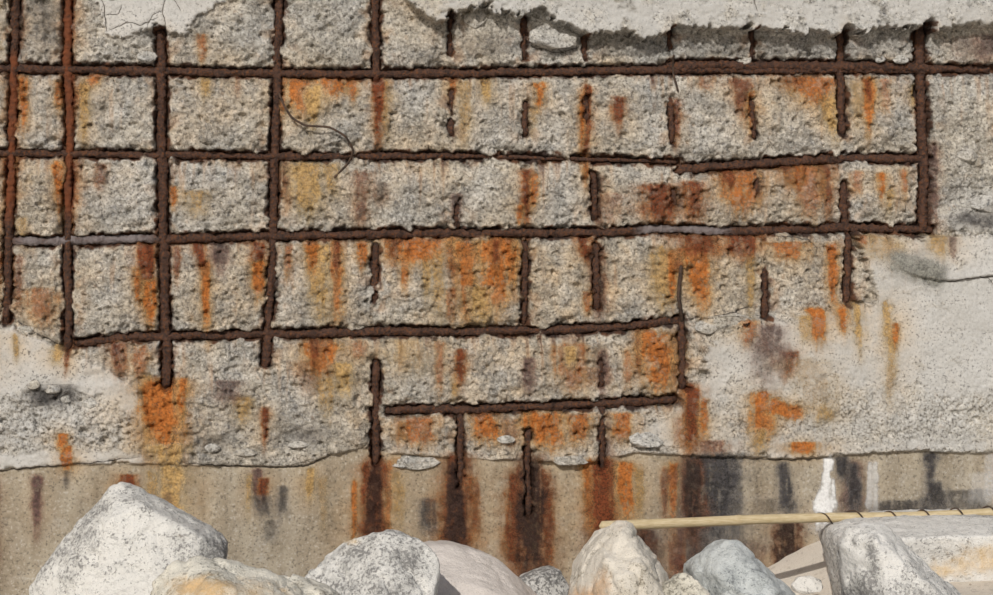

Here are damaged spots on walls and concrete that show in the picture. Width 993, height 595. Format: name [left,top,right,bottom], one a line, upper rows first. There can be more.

crack [102,0,181,34]
rust [384,236,521,324]
spalling [0,0,993,470]
rust [639,169,764,224]
rust [650,234,812,310]
rust [110,343,188,511]
rust [351,458,393,540]
rust [436,454,480,546]
rust [471,410,591,576]
rust [579,458,645,533]
leakage [771,462,803,564]
leakage [813,452,985,527]